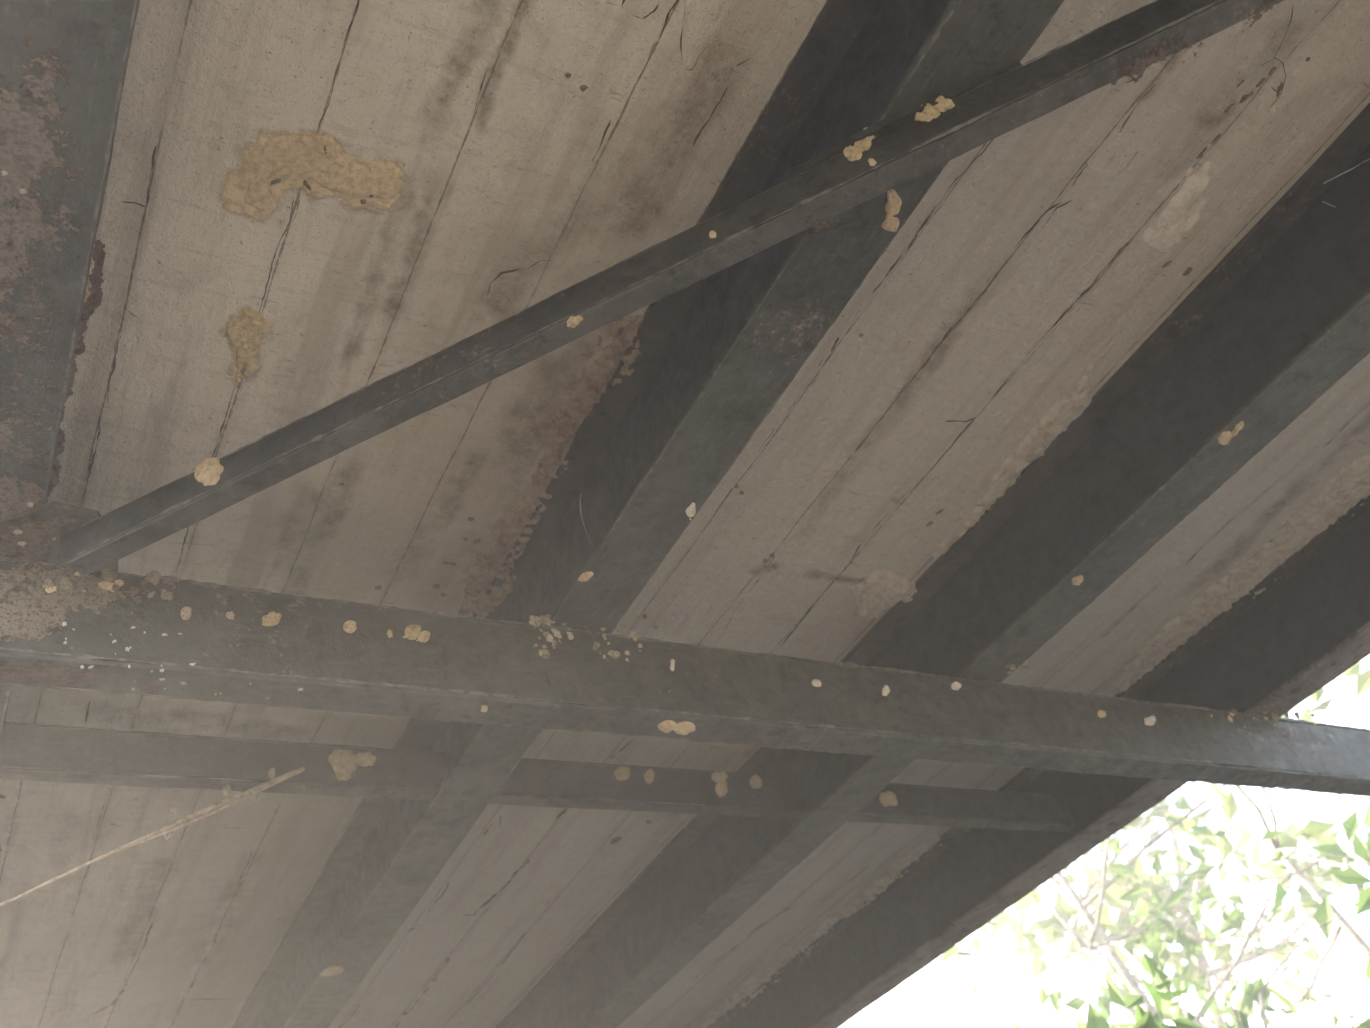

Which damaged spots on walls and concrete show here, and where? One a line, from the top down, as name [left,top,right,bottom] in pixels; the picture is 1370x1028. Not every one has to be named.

crack [316,0,360,135]
corrosion [0,76,84,348]
crack [122,146,156,207]
crack [259,190,300,313]
crack [592,120,611,161]
crack [759,139,994,450]
crack [855,76,1154,452]
corrosion [0,405,45,518]
crack [82,312,140,505]
crack [212,379,237,458]
crack [781,209,1162,646]
corrosion [0,560,158,643]